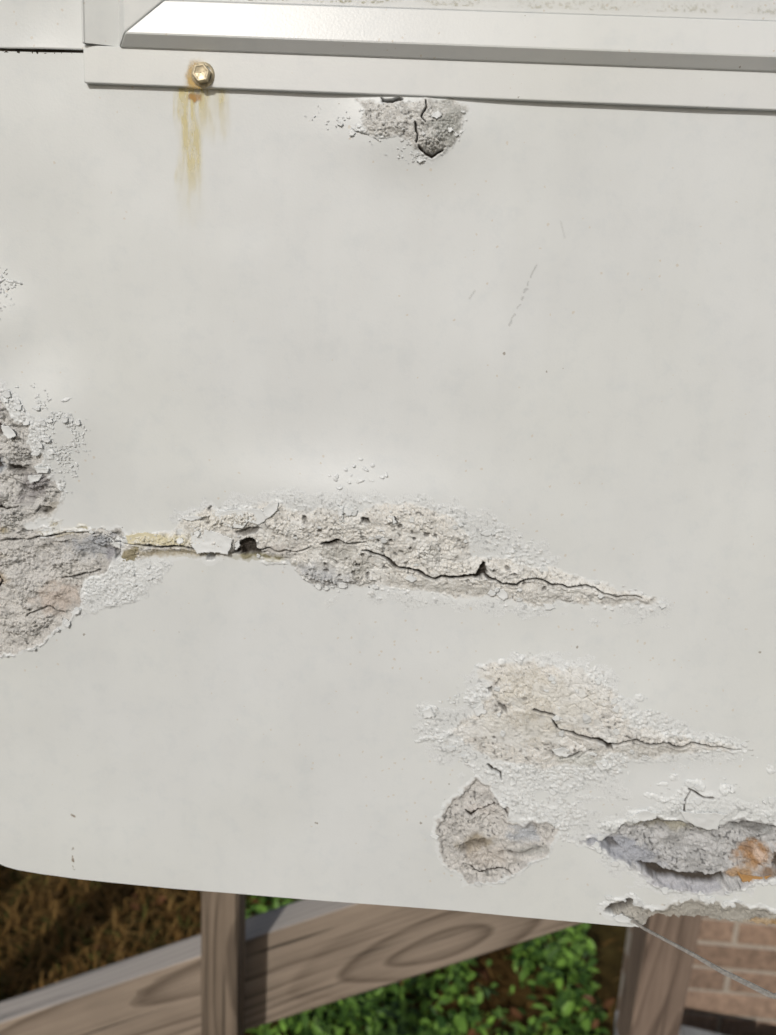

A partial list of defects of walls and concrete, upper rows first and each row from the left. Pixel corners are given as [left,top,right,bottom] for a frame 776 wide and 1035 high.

corrosion [179,63,200,147]
spalling [304,95,472,164]
peeling [0,378,674,659]
peeling [411,648,776,927]